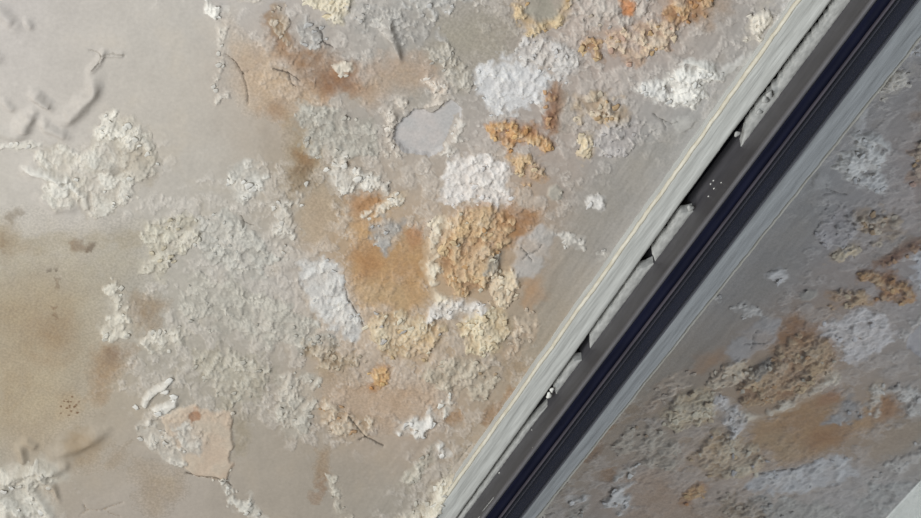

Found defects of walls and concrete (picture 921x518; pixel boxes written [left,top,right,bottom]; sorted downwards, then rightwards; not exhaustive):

peeling [0,107,164,223]
peeling [202,0,236,110]
flaking render [262,0,475,229]
corrosion [219,0,577,200]
corrosion [338,191,550,315]
peeling [510,33,648,167]
peeling [560,229,614,263]
peeling [583,190,607,214]
peeling [567,0,657,31]
corrosion [578,0,736,70]
peeling [95,157,541,518]
peeling [0,451,75,518]